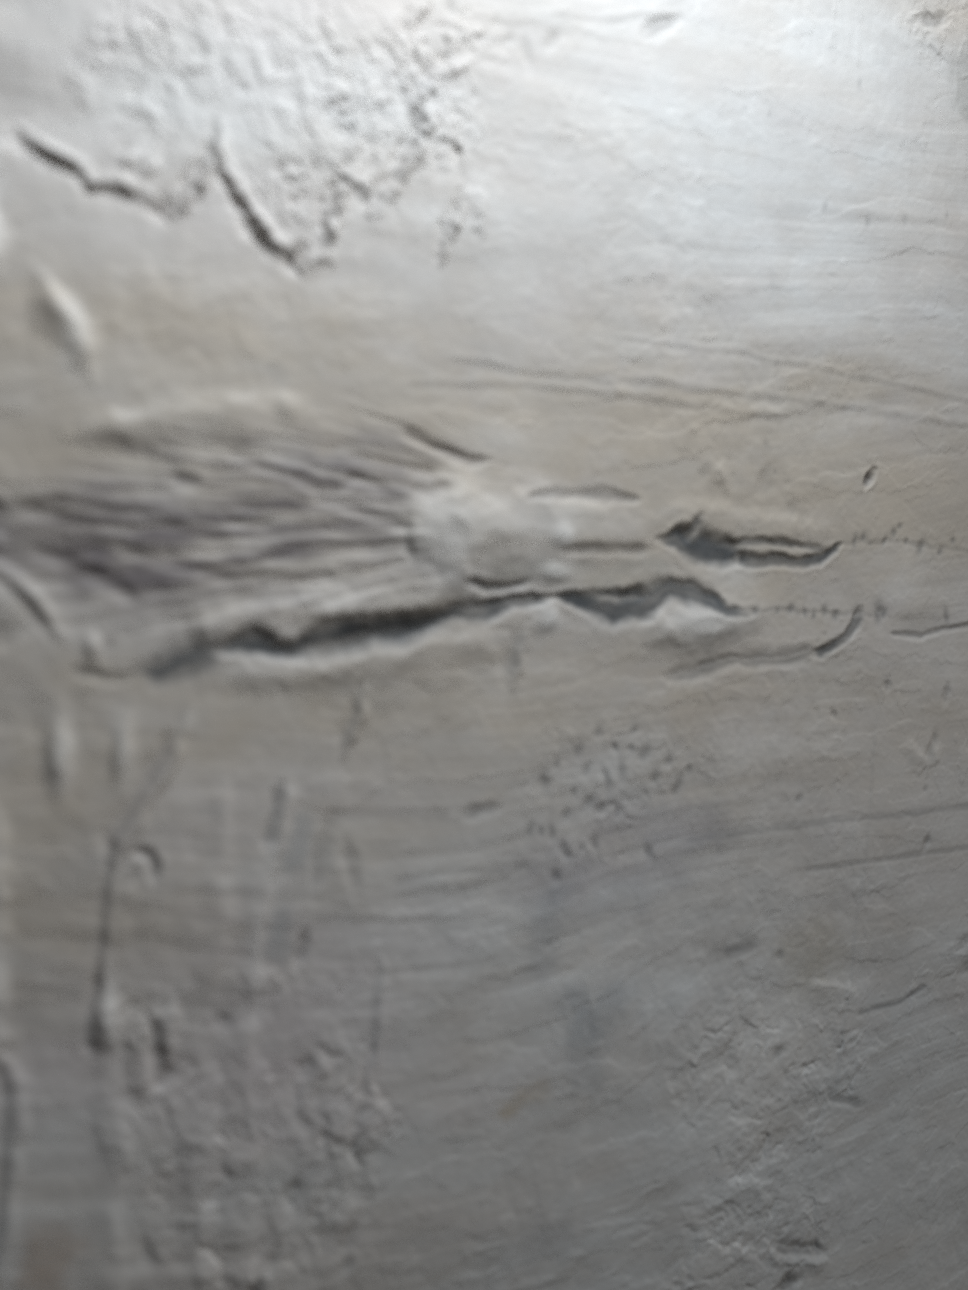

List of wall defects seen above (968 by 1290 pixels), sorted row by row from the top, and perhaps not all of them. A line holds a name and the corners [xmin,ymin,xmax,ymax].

crack [64,513,968,699]